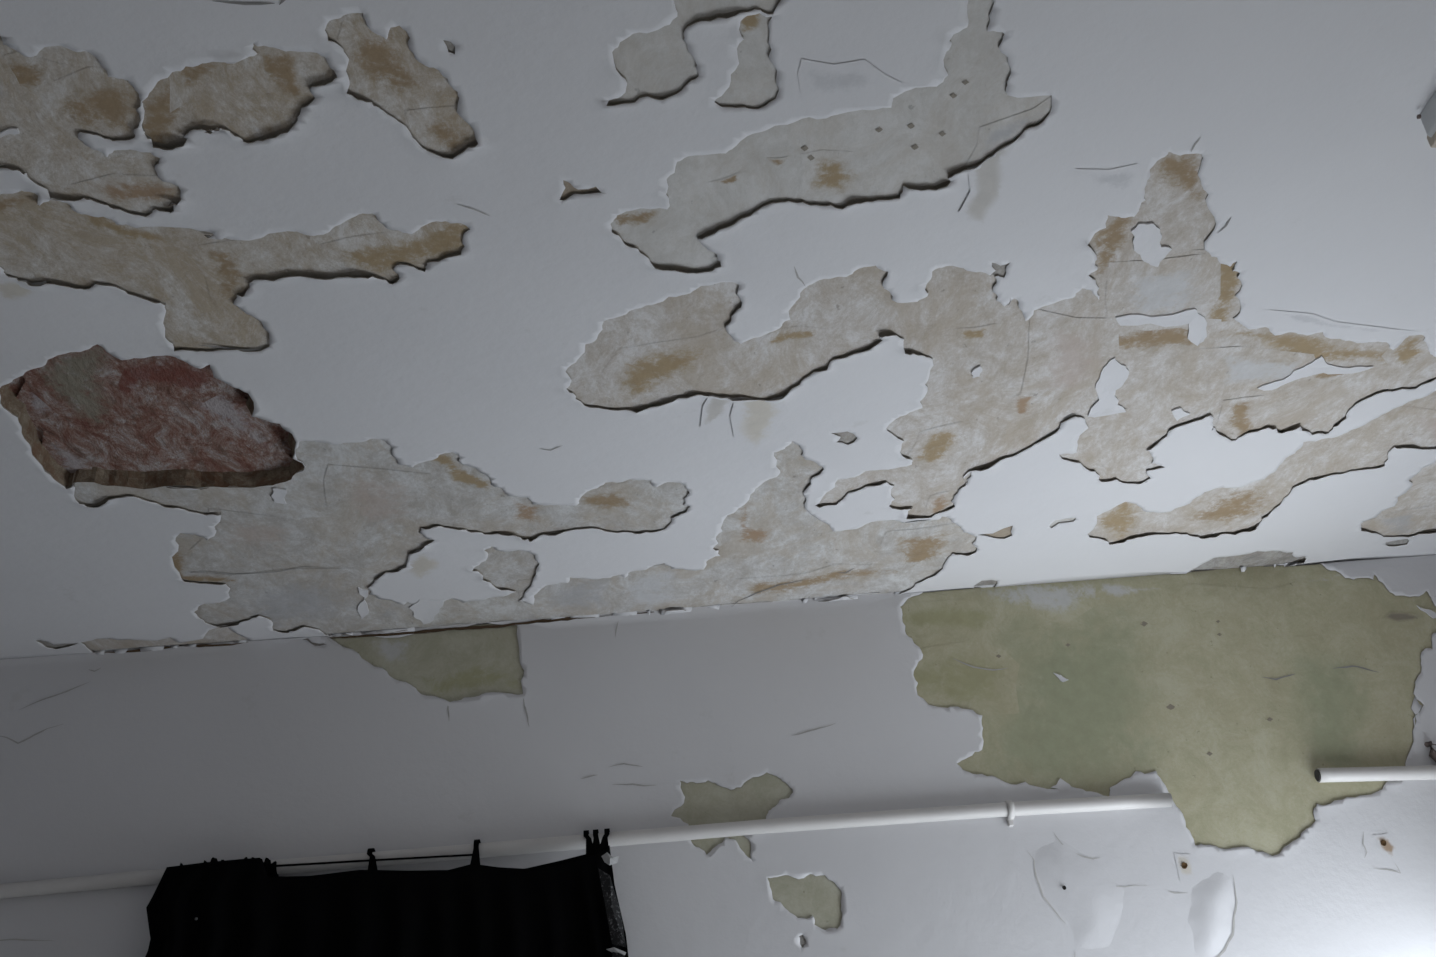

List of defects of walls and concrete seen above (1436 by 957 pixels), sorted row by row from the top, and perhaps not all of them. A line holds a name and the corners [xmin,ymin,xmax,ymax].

peeling [0,0,1436,702]
peeling [671,773,793,859]
peeling [768,874,842,947]
peeling [901,551,1436,856]